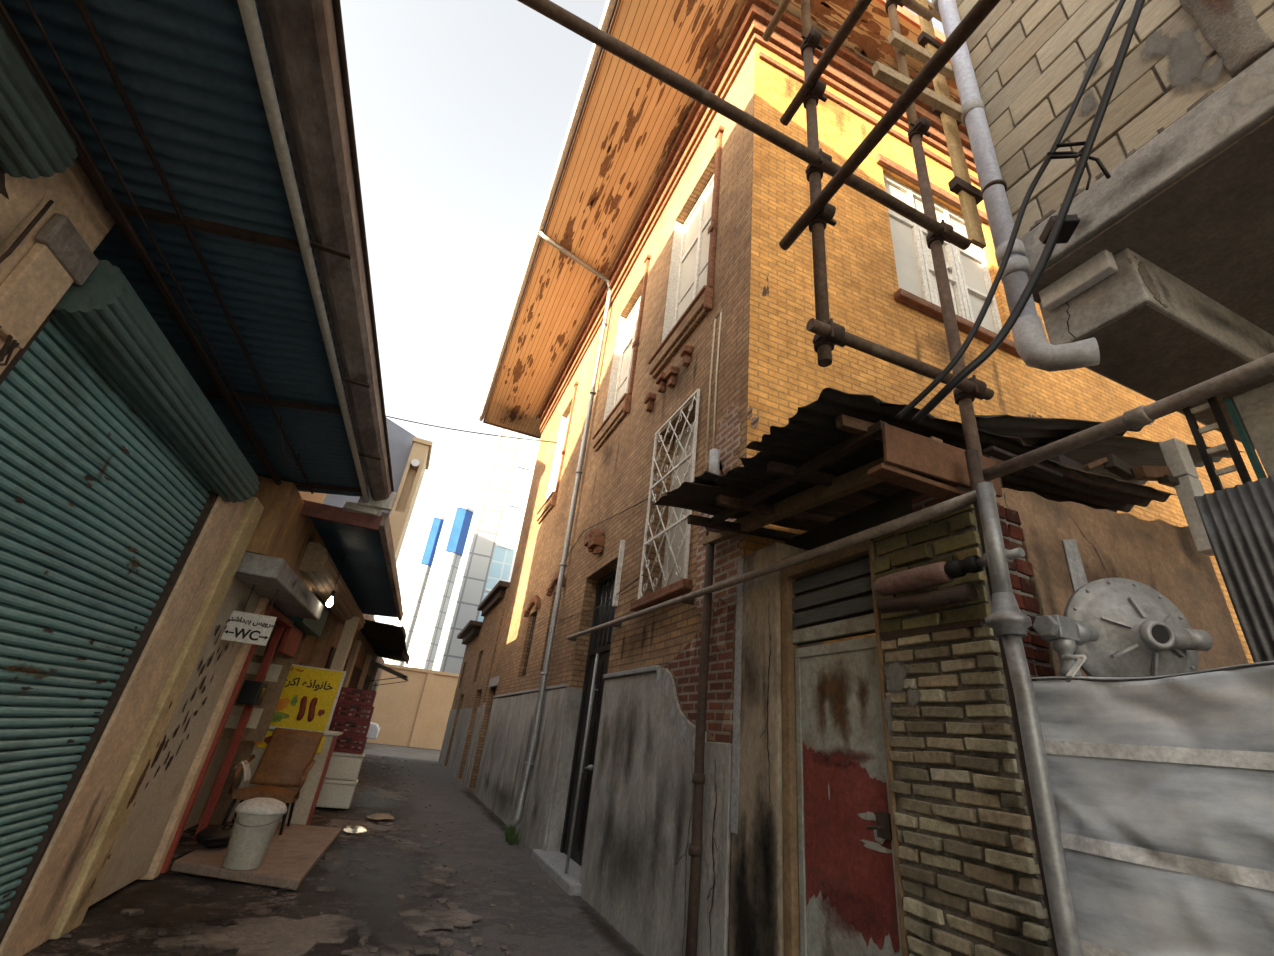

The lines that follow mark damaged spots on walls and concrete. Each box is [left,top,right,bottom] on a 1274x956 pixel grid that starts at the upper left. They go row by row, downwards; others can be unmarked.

peeling [673,0,738,85]
spalling [0,166,9,199]
peeling [500,76,695,424]
rust [7,666,57,694]
rust [816,673,867,741]
damp [734,825,749,956]
damp [760,810,774,956]